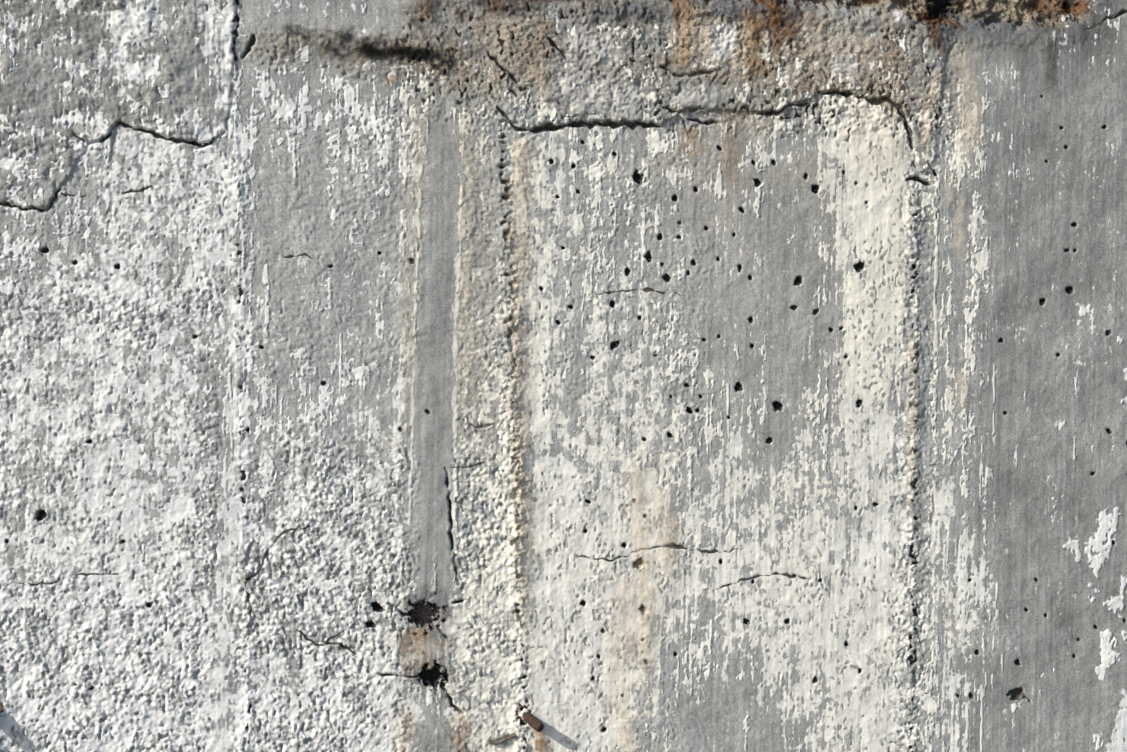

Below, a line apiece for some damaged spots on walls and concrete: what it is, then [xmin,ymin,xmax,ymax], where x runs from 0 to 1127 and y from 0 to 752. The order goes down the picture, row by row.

crack [1083,10,1127,31]
damp [340,34,455,73]
crack [548,38,566,59]
crack [489,56,716,137]
crack [72,121,215,148]
crack [741,79,937,186]
crack [0,190,86,213]
crack [122,186,152,194]